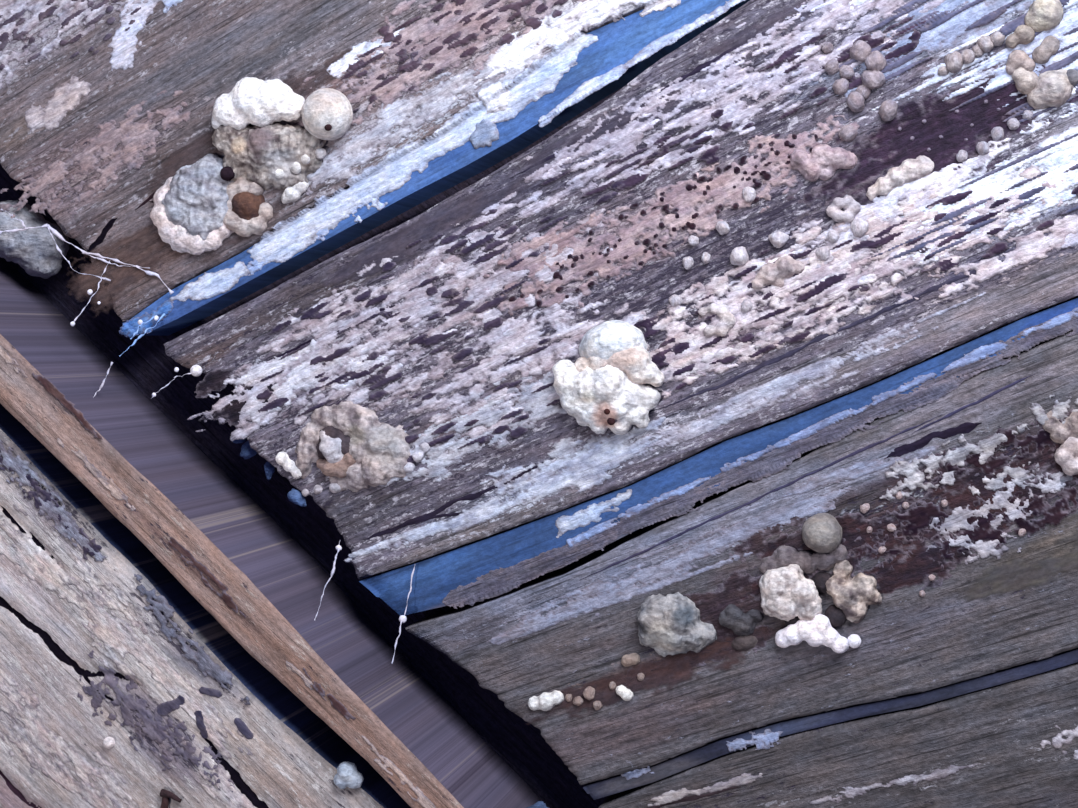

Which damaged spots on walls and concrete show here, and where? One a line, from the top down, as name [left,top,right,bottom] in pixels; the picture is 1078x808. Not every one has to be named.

peeling [119,0,1078,563]
peeling [442,307,1078,645]
crack [0,597,137,701]
crack [0,770,42,808]
crack [200,733,269,808]